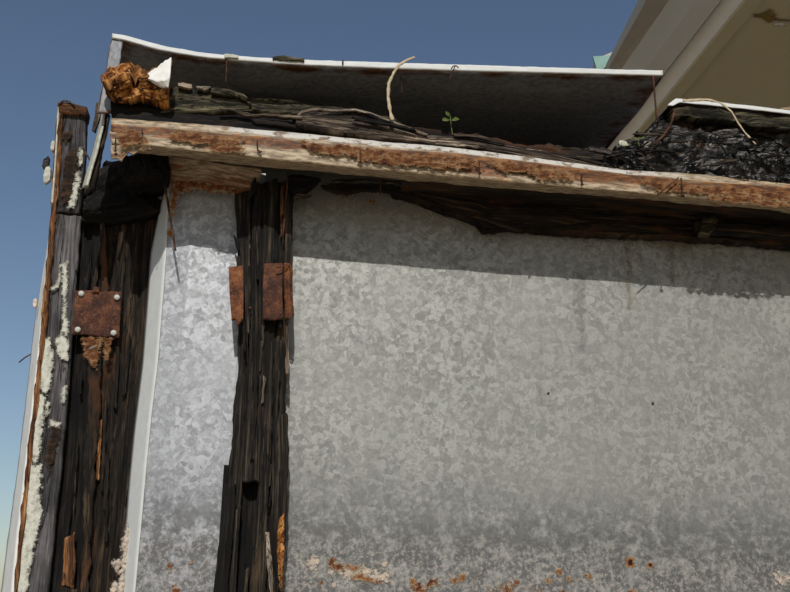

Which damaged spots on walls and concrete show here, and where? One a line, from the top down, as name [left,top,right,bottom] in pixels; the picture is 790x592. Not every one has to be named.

crack [752,10,790,23]
rust [169,130,246,154]
rust [301,139,581,183]
rust [167,180,244,237]
rust [640,178,790,209]
rust [81,336,113,368]
water stain [45,425,61,468]
rust [489,579,521,592]